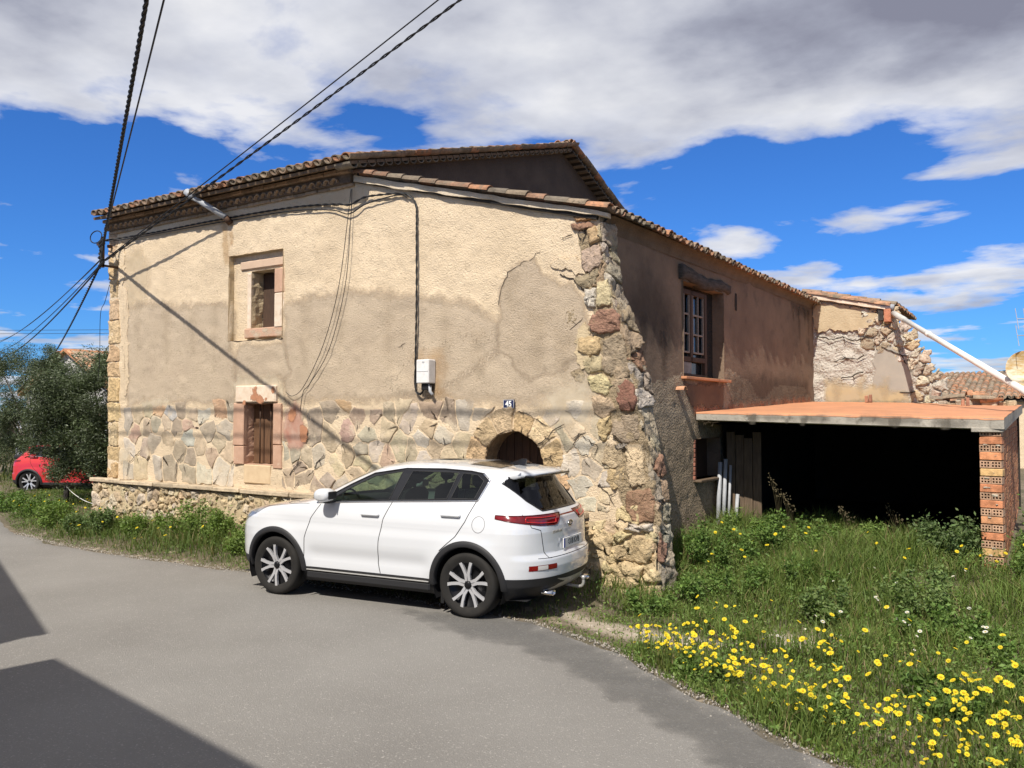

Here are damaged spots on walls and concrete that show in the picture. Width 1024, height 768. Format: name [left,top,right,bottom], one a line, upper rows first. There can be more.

spalling [550,233,624,383]
flaking render [812,303,878,333]
spalling [602,370,662,526]